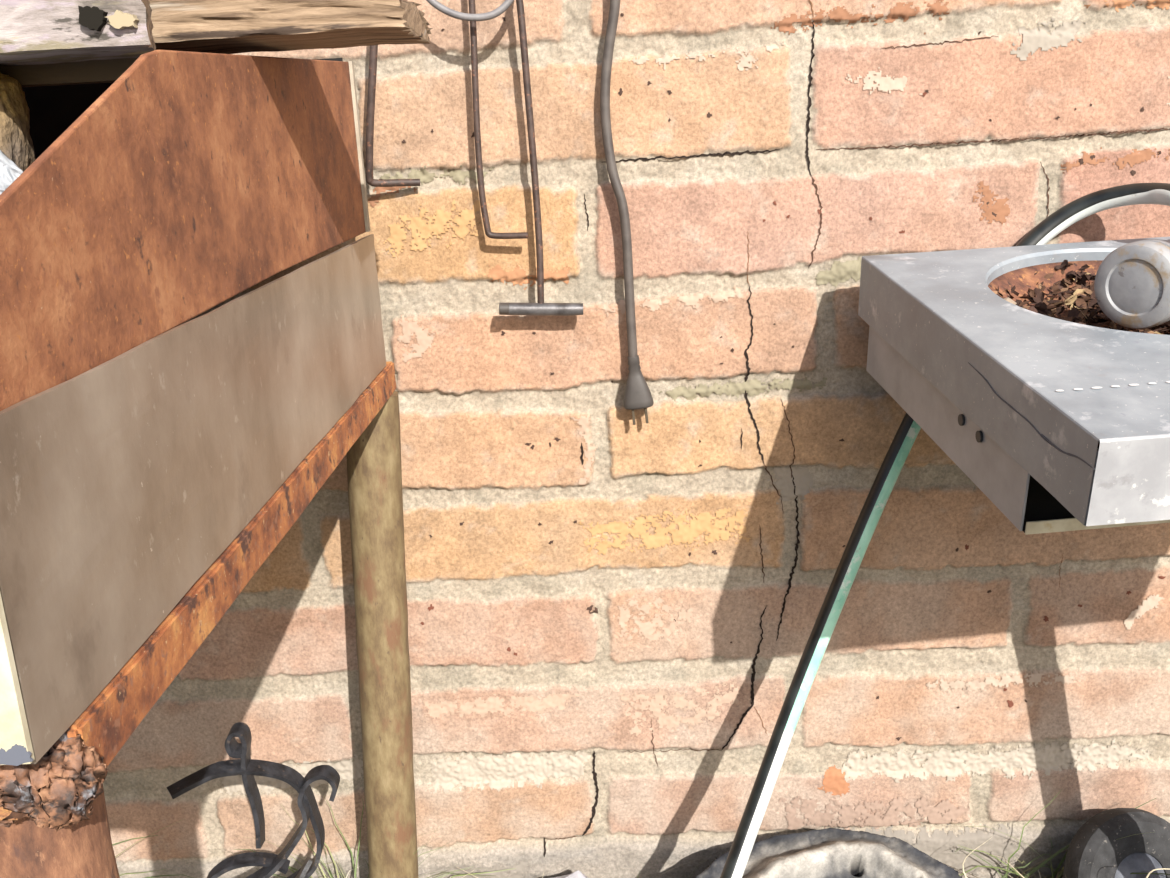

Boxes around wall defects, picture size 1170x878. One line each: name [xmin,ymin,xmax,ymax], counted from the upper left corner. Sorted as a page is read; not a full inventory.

crack [624,231,800,766]
crack [544,752,599,857]